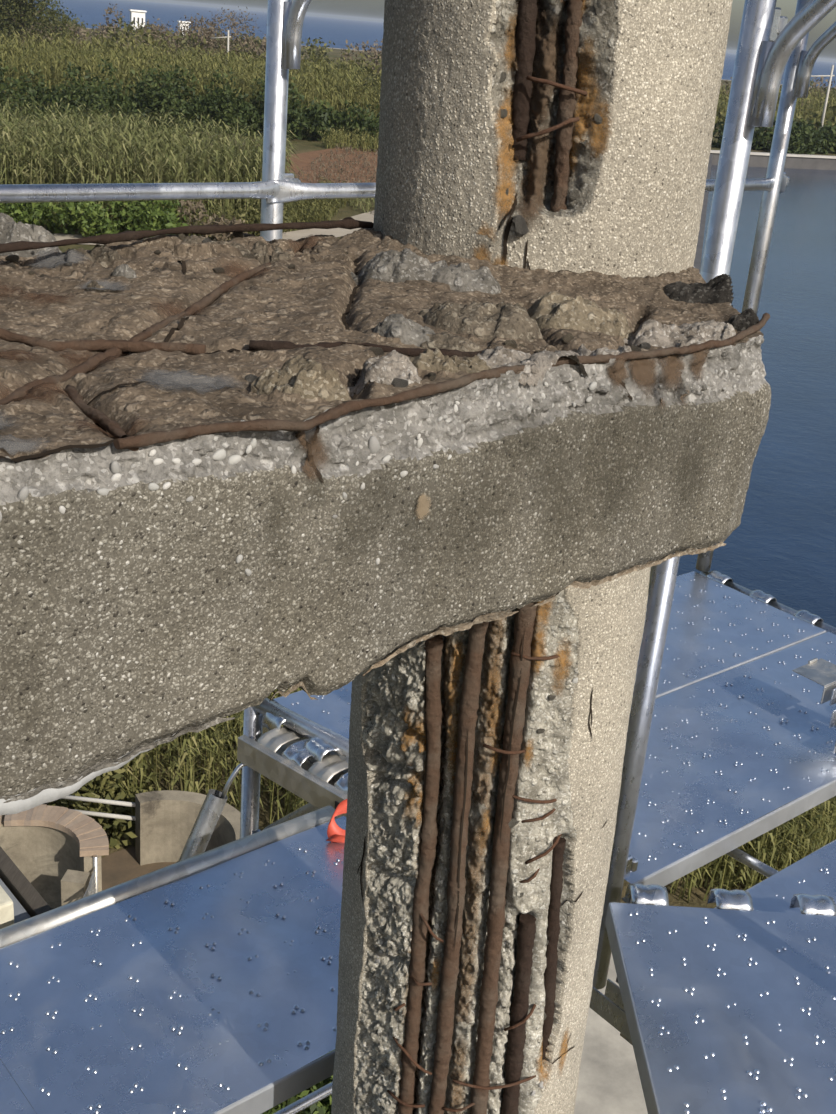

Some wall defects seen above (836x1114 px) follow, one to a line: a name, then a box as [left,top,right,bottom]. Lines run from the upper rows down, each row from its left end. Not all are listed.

rust [496,0,608,222]
spalling [487,0,618,237]
crack [177,260,187,274]
crack [0,317,260,462]
crack [295,425,324,483]
spalling [0,335,770,522]
rust [607,348,709,404]
rust [439,635,464,796]
rust [530,600,570,680]
rust [460,620,503,1022]
spalling [354,542,726,1114]
rust [421,837,440,1009]